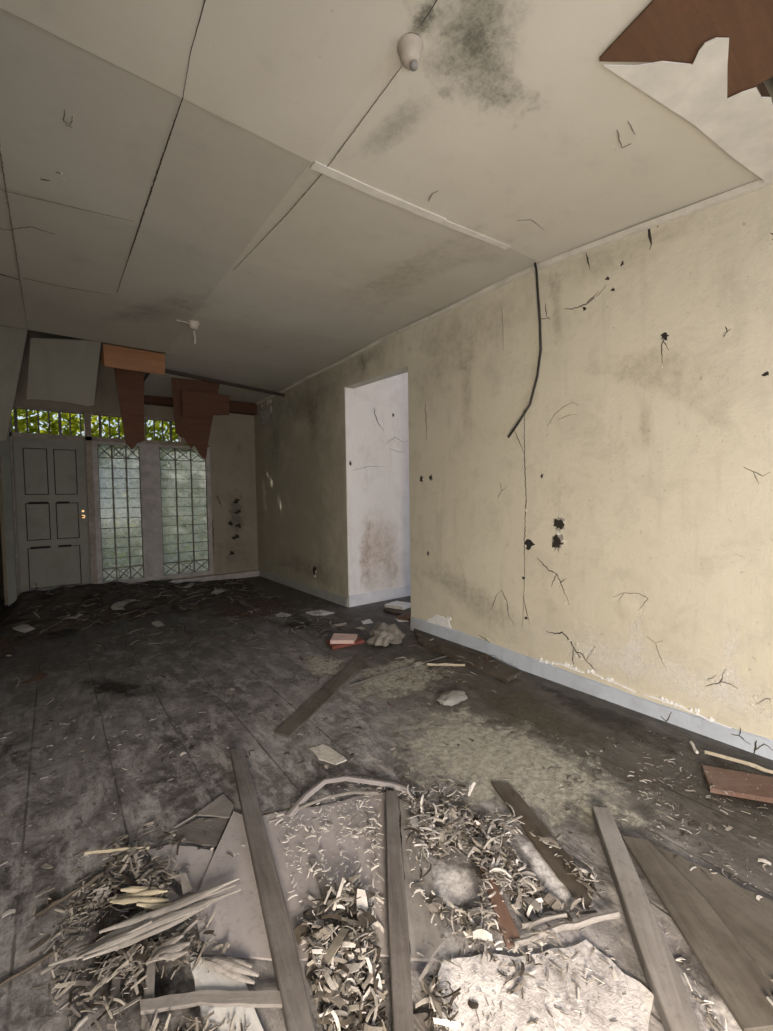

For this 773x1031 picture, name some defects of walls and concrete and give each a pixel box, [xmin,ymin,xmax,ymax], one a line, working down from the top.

crack [541,254,624,320]
crack [492,402,595,669]
peeling [427,615,451,628]
crack [707,669,773,754]